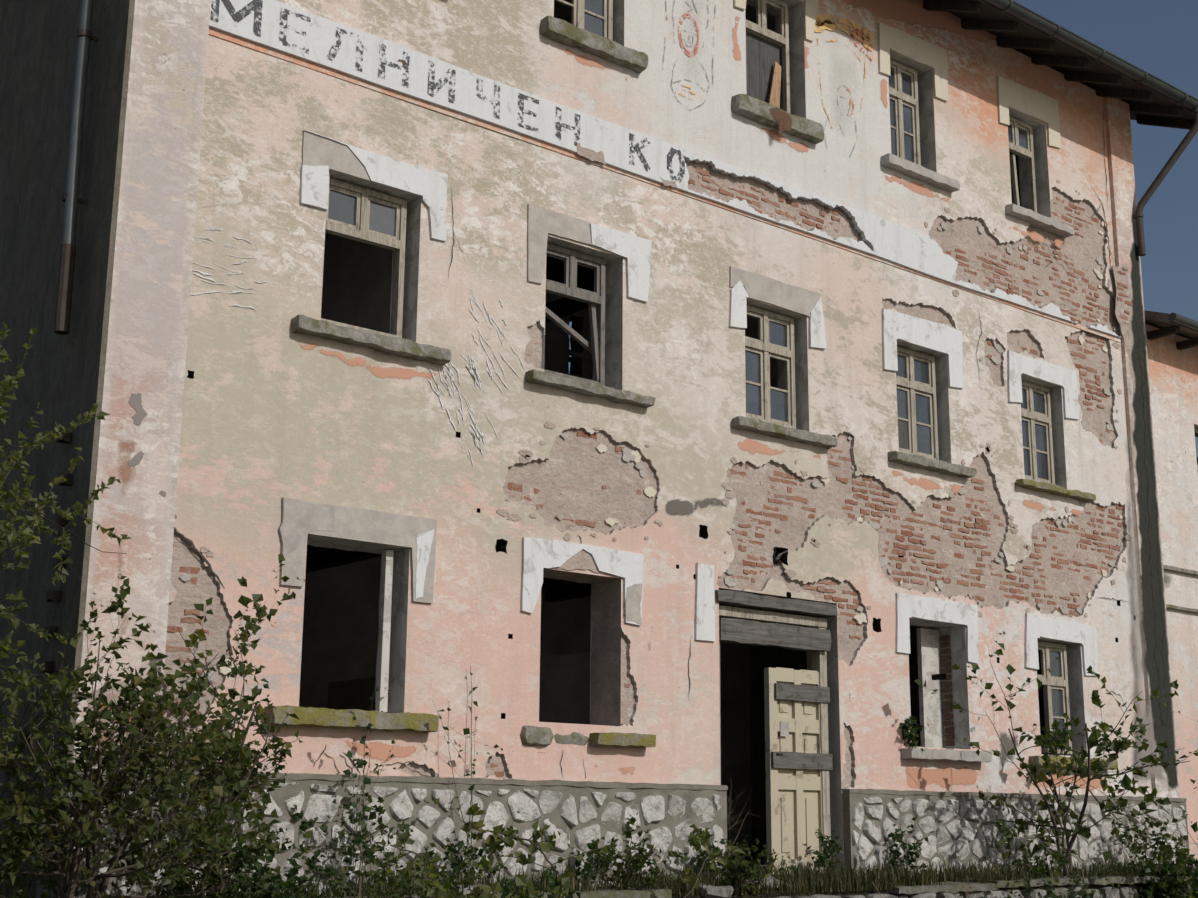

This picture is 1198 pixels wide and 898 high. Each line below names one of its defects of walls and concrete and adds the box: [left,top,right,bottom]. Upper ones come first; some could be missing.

crack [448,188,463,279]
flaking render [684,158,870,248]
flaking render [882,175,1136,449]
peeling [129,393,147,426]
peeling [301,288,545,466]
flaking render [496,421,663,541]
flaking render [717,431,1132,666]
flaking render [87,528,236,768]
flaking render [616,627,638,726]